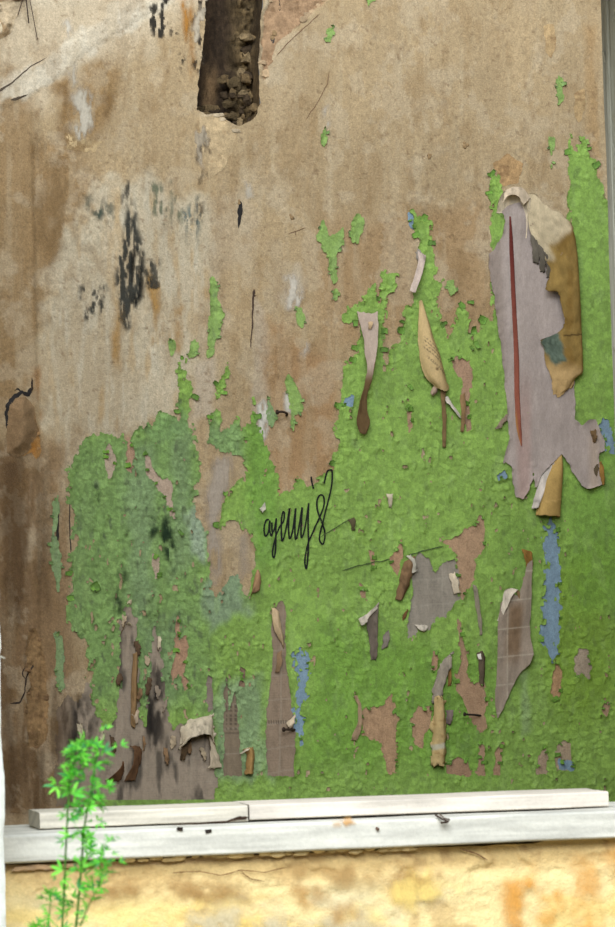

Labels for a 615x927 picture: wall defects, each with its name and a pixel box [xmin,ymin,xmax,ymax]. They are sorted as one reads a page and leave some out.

spalling [0,0,22,38]
spalling [258,0,326,79]
peeling [324,23,335,42]
peeling [554,76,567,105]
spalling [199,113,241,177]
peeling [321,126,330,147]
peeling [47,134,615,807]